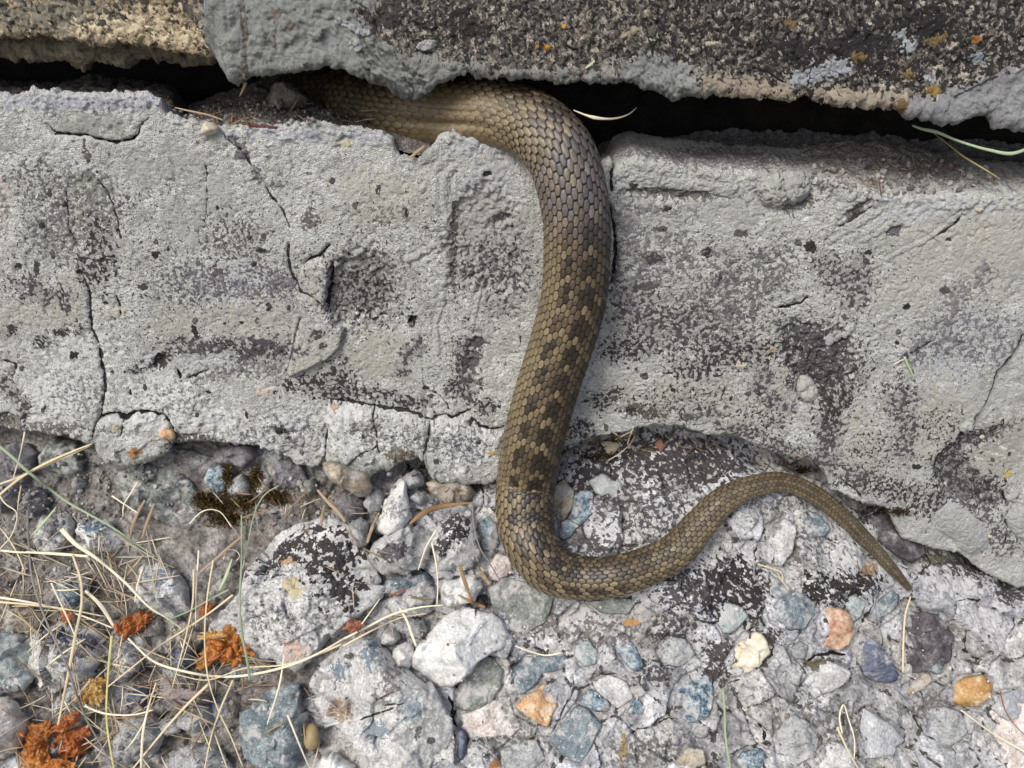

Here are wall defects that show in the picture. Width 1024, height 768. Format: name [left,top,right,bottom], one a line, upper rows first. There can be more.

crack [752,66,784,83]
crack [954,76,999,97]
crack [49,117,150,144]
crack [66,191,78,244]
crack [100,182,122,238]
crack [224,134,334,371]
crack [59,271,174,438]
crack [177,369,208,382]
crack [933,335,1023,492]